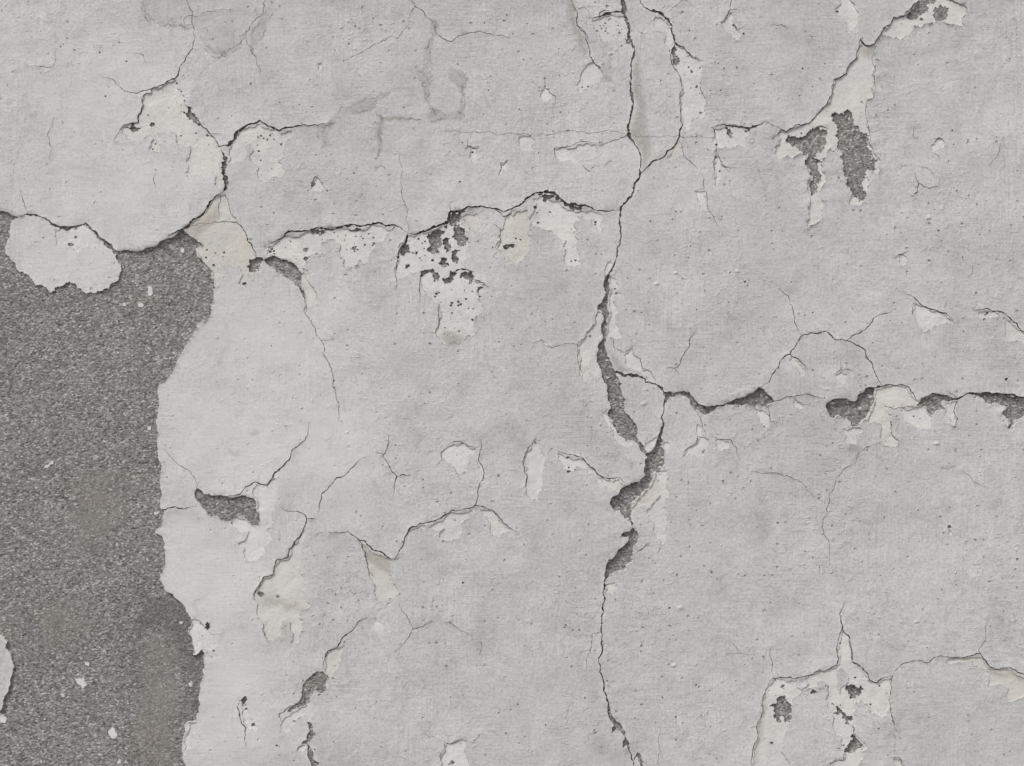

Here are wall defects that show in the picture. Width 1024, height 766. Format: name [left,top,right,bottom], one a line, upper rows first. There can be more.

crack [179,0,919,334]
peeling [775,0,967,227]
peeling [394,211,487,346]
peeling [0,81,395,766]
crack [229,429,309,496]
crack [254,436,519,596]
spalling [558,260,670,594]
crack [613,329,697,441]
spalling [665,388,773,457]
crack [756,294,1024,568]
peeling [826,385,957,446]
crack [586,584,610,707]